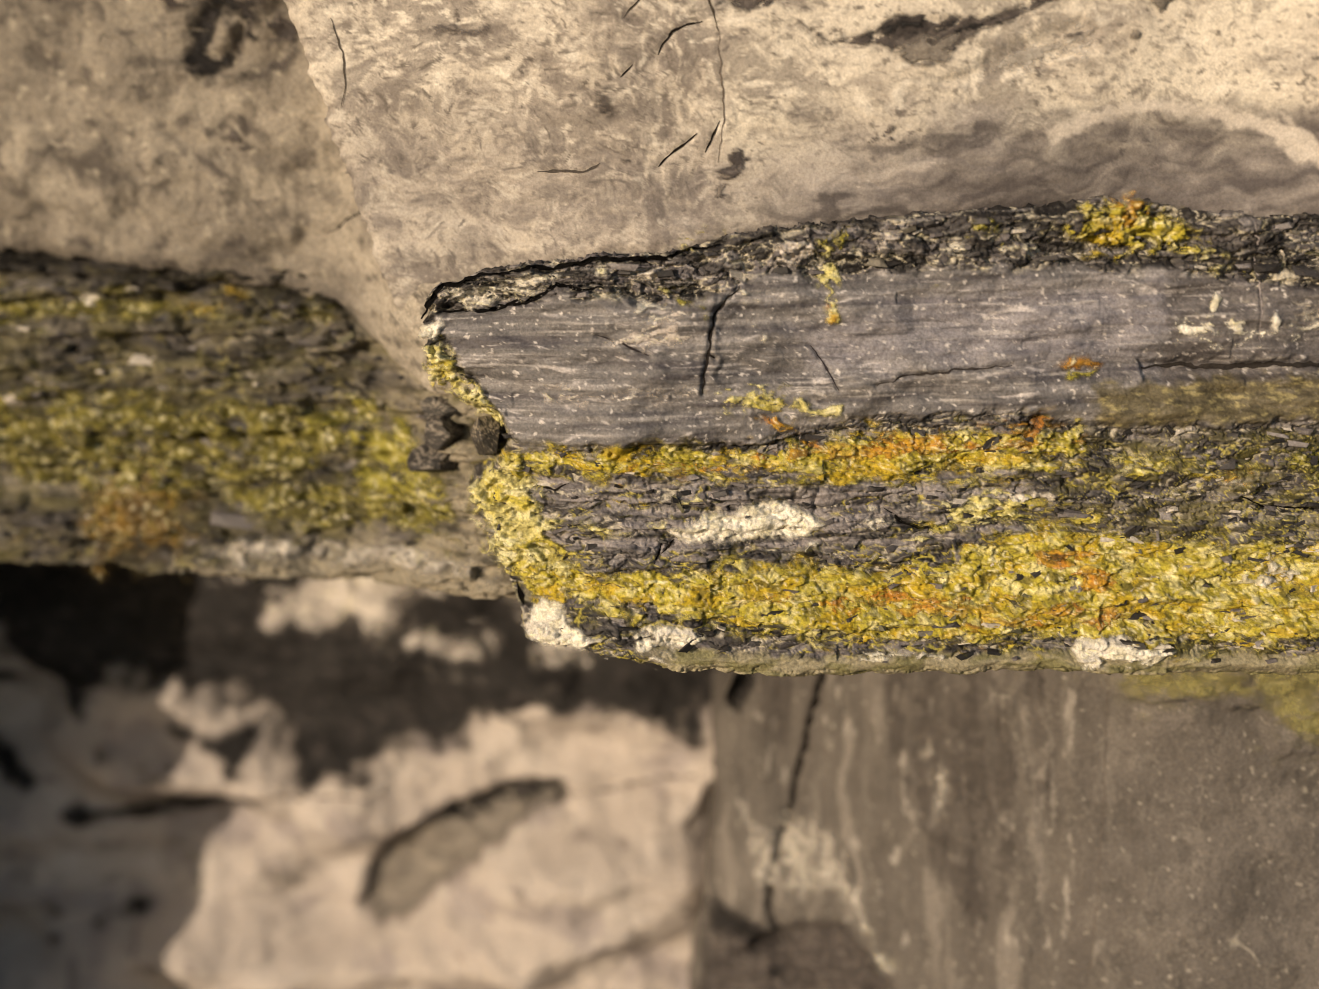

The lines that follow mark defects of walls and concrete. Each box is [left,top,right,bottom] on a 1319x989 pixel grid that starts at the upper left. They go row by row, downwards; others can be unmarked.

crack [621,0,725,167]
crack [767,674,826,927]